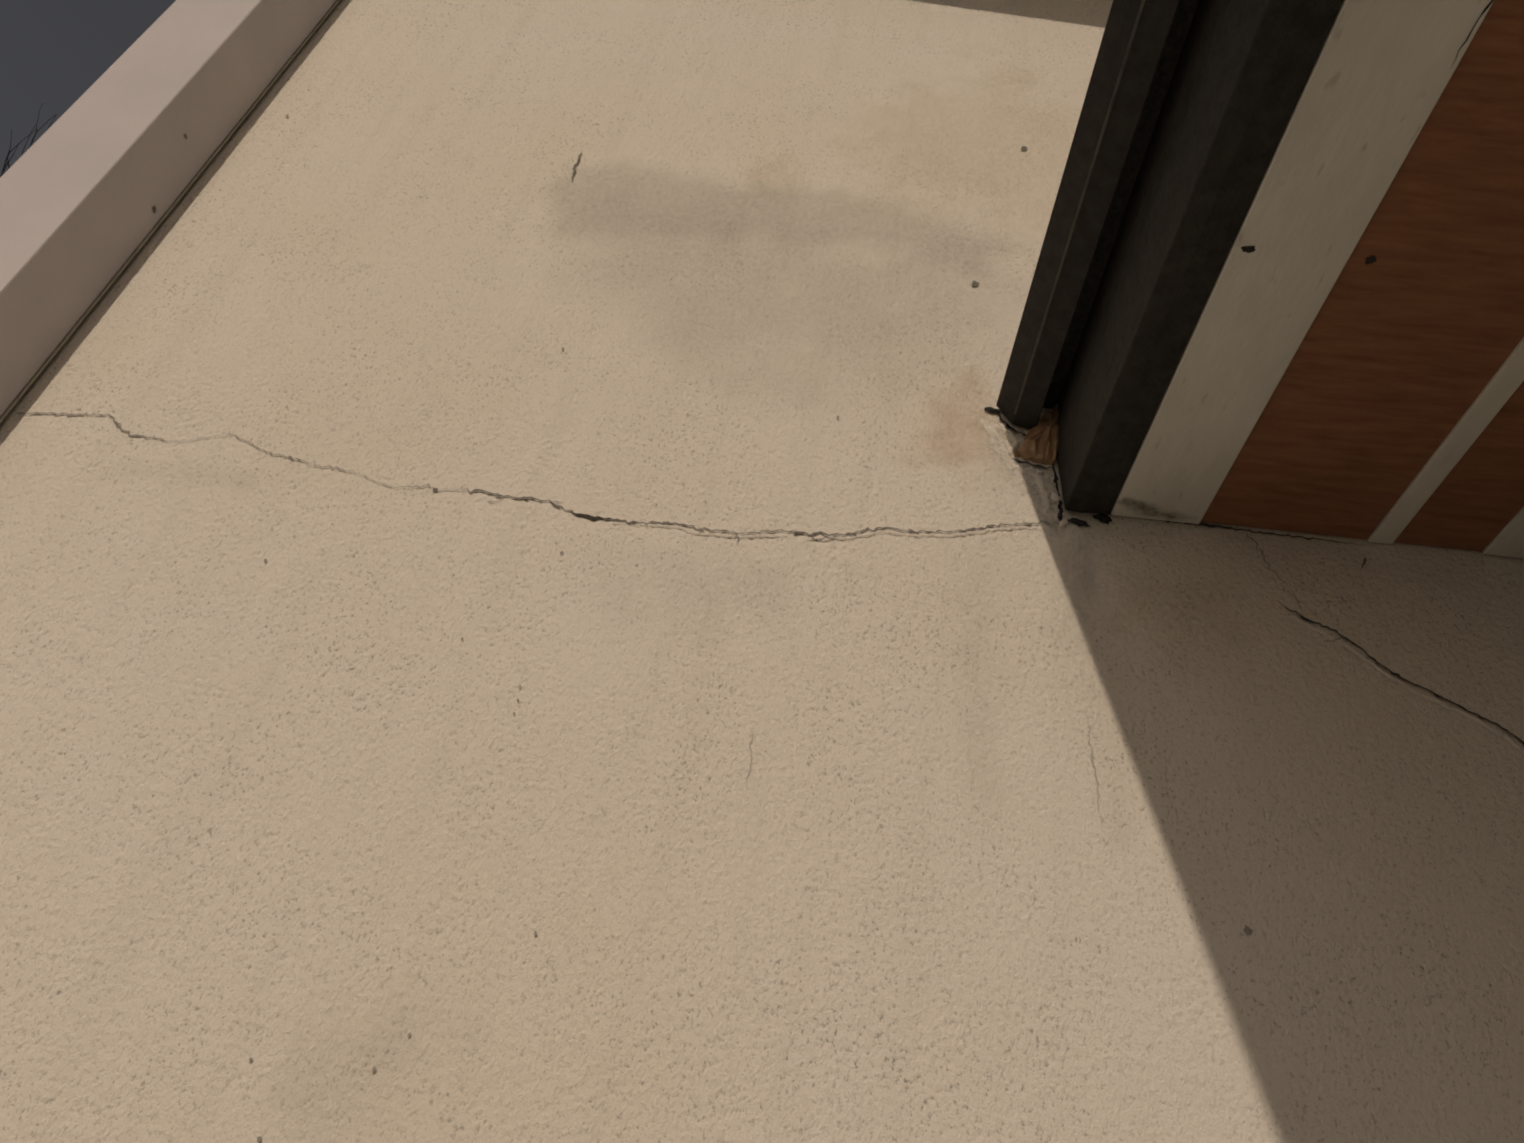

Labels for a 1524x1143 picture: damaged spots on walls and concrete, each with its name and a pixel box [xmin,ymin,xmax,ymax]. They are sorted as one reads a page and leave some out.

crack [16,412,1059,544]
flaking render [976,413,1069,528]
crack [1160,520,1524,754]